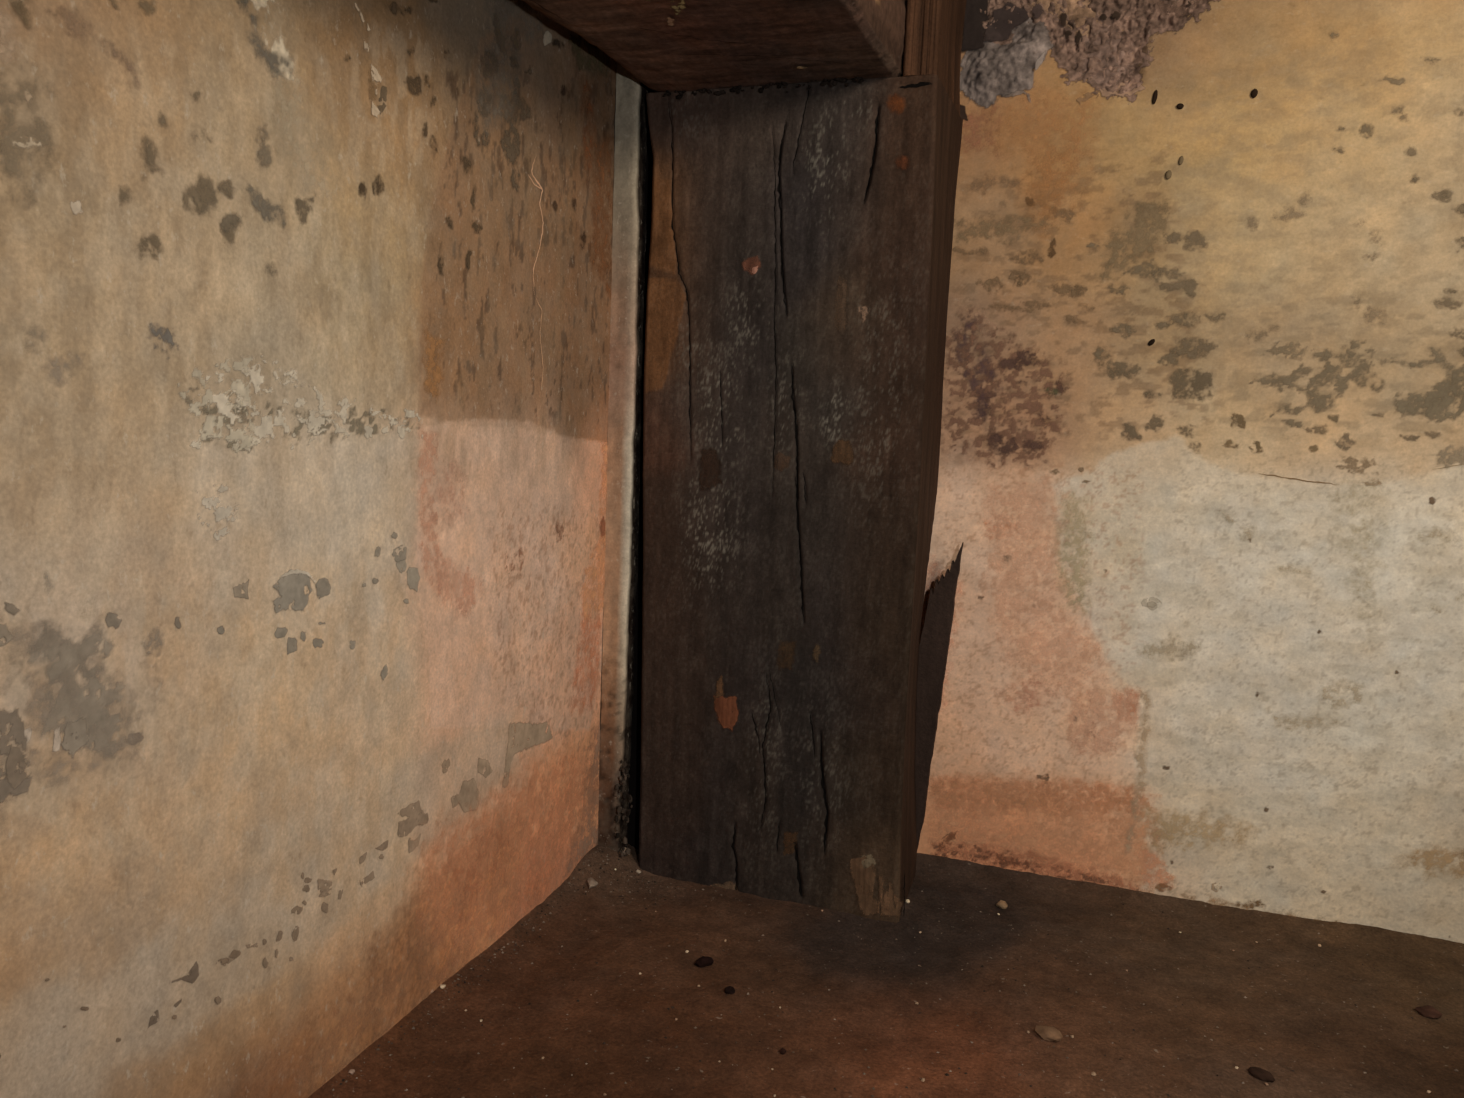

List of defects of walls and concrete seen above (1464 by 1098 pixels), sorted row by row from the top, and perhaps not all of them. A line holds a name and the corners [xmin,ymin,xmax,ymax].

damp [183,0,328,242]
damp [359,176,384,195]
spalling [961,0,1220,104]
peeling [178,356,423,453]
crack [669,108,723,445]
crack [772,85,809,617]
damp [941,179,1207,467]
damp [1144,313,1225,400]
damp [1225,414,1262,452]
damp [1247,328,1464,486]
peeling [233,580,249,599]
peeling [0,602,144,803]